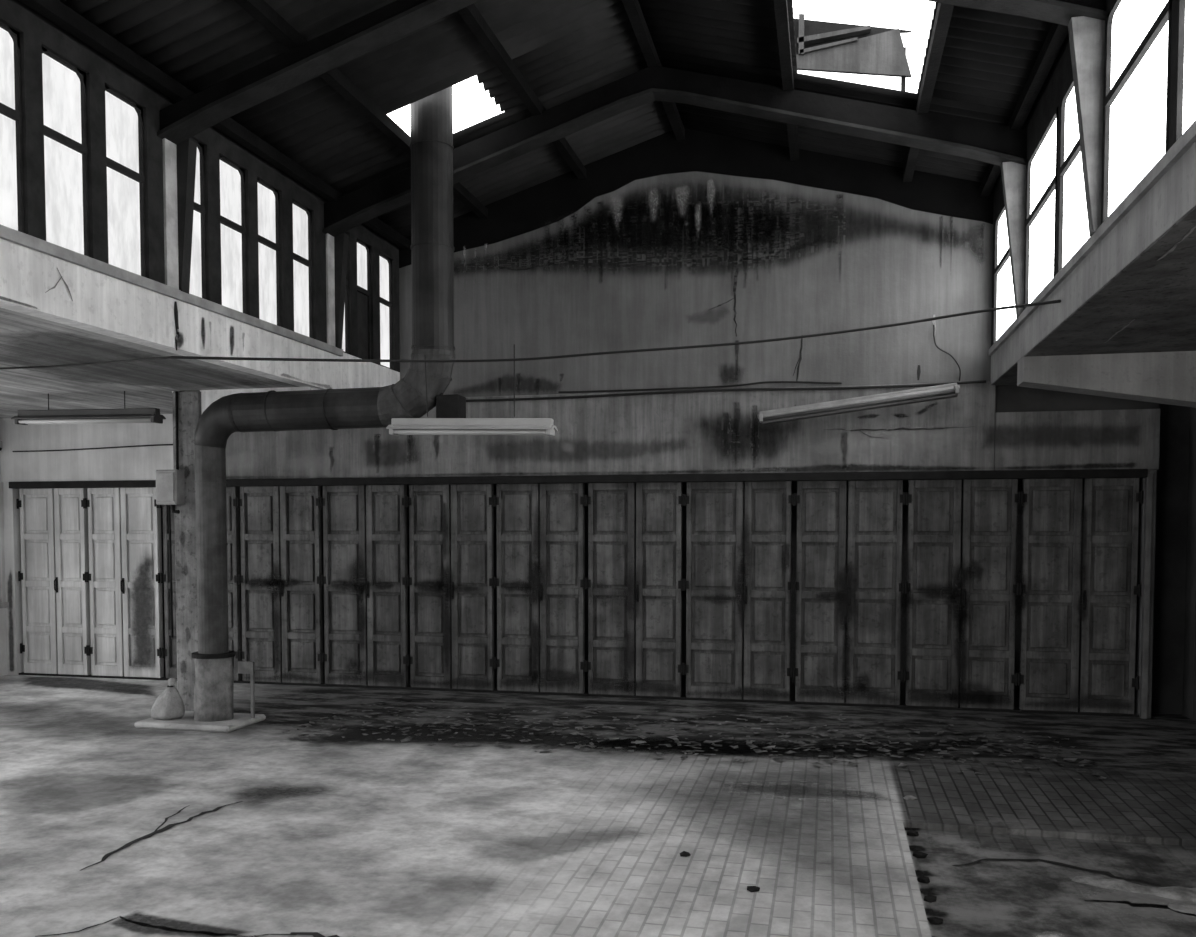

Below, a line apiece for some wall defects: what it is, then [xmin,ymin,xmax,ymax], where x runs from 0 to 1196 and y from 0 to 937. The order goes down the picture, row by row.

leakage [454,184,983,282]
leakage [662,403,975,473]
leakage [254,669,679,693]
leakage [705,684,888,699]
crack [80,786,328,871]
crack [35,913,340,937]